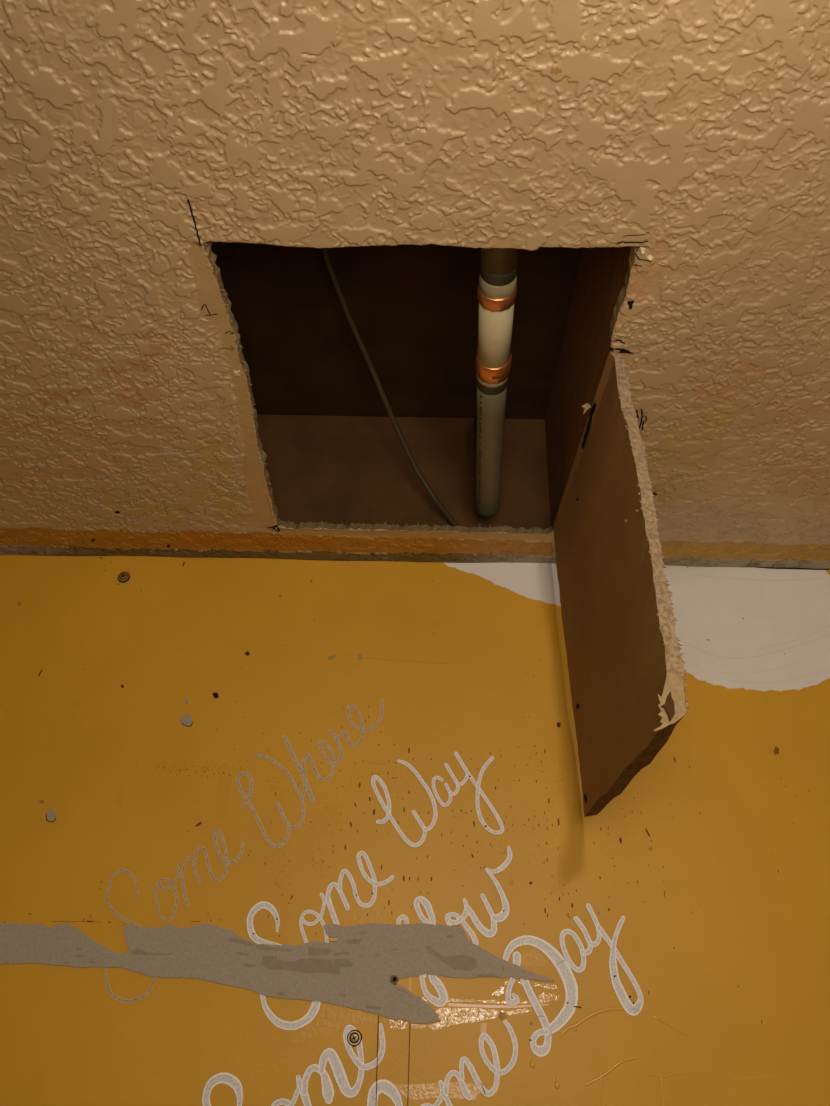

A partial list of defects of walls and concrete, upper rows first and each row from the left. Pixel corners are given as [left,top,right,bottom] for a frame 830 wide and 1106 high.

peeling [0,923,553,1023]